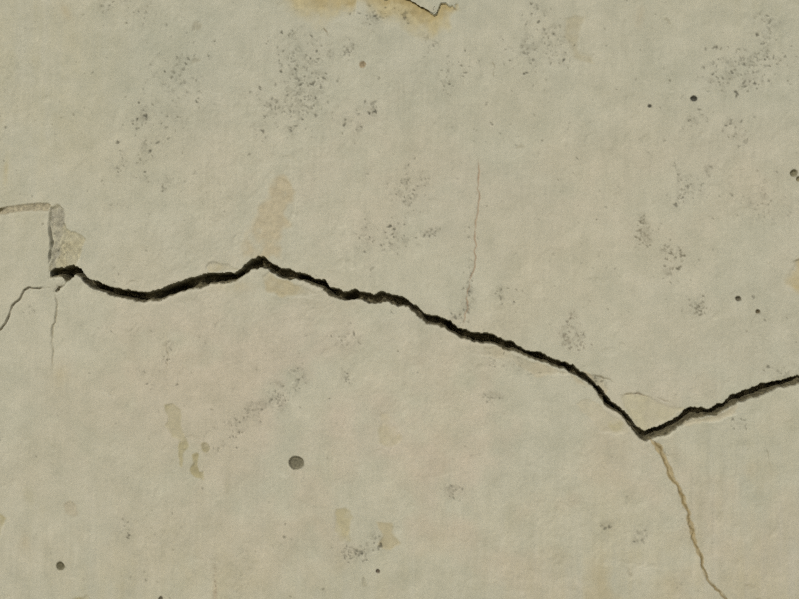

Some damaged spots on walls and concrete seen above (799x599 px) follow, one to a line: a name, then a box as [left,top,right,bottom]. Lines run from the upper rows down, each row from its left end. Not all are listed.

peeling [283,0,459,41]
spalling [48,203,86,272]
crack [0,163,799,599]